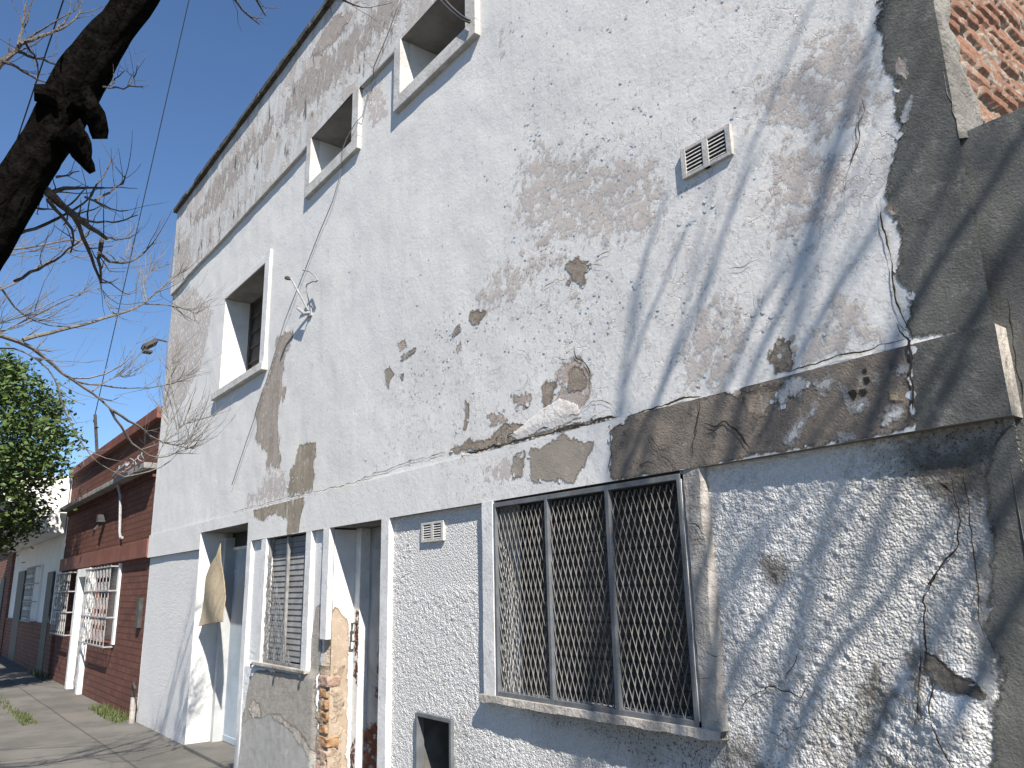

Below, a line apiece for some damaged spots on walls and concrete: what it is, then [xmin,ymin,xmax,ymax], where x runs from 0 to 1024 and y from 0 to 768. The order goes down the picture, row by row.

peeling [253,331,317,535]
spalling [385,306,506,424]
crack [233,349,750,512]
peeling [449,0,1024,768]
crack [789,212,918,410]
spalling [238,605,350,768]
crack [917,468,986,768]